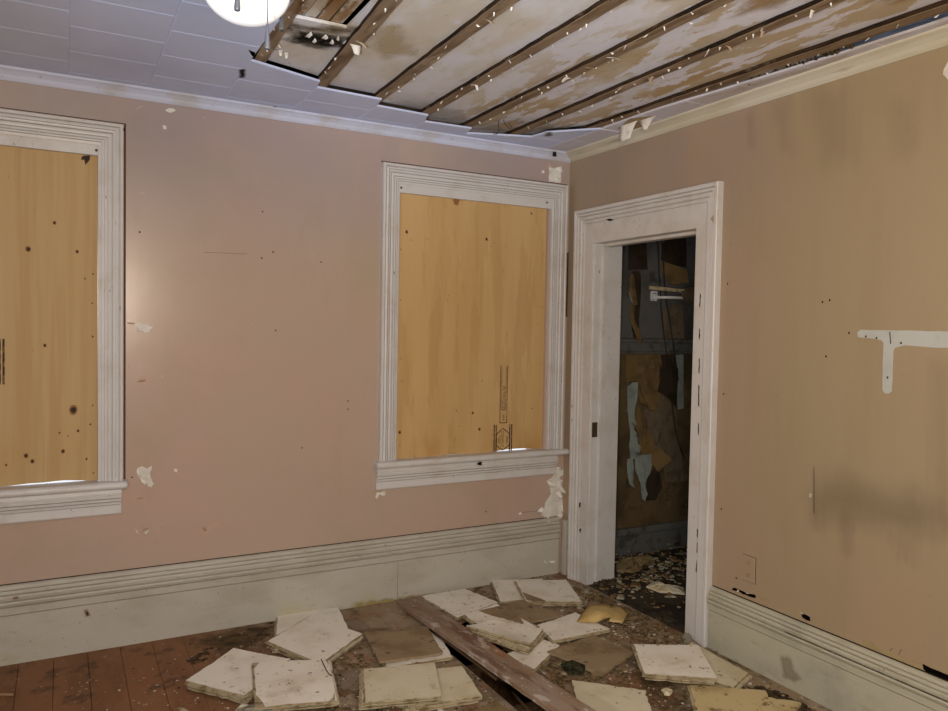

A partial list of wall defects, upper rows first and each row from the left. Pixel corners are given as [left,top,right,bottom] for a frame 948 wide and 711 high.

leakage [745,0,785,12]
peeling [618,116,655,141]
peeling [136,466,154,499]
peeling [537,467,566,522]